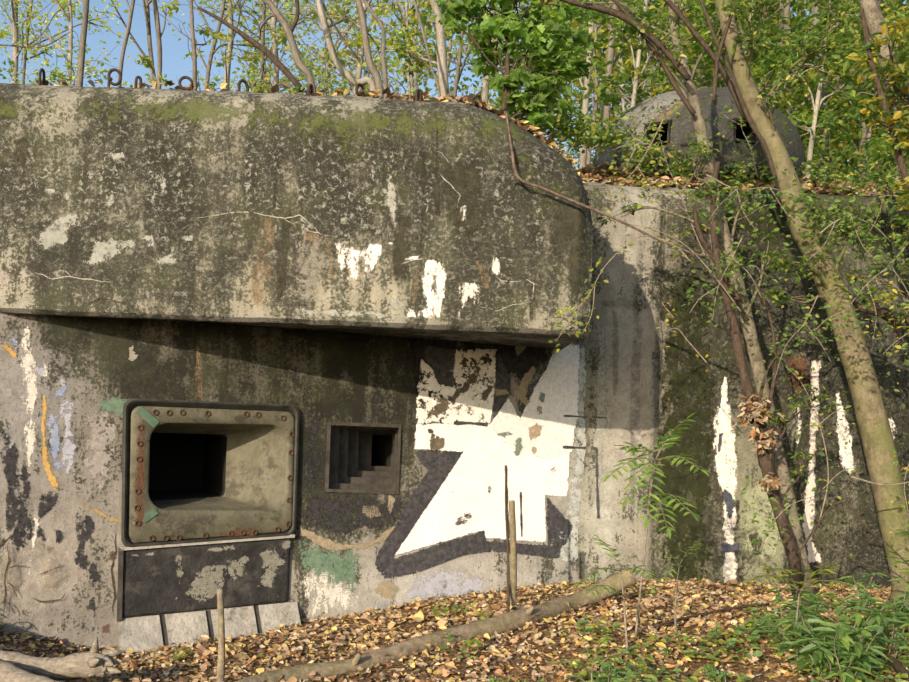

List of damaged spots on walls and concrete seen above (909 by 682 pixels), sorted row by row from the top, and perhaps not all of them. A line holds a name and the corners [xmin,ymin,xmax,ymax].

crack [37,270,129,305]
crack [199,211,329,236]
peeling [296,233,447,319]
water stain [393,213,424,282]
water stain [421,131,493,236]
water stain [549,201,585,307]
peeling [427,366,545,456]
rust [136,419,145,524]
crack [0,536,66,614]
peeling [176,545,249,602]
peeling [257,495,407,593]
water stain [749,532,763,555]